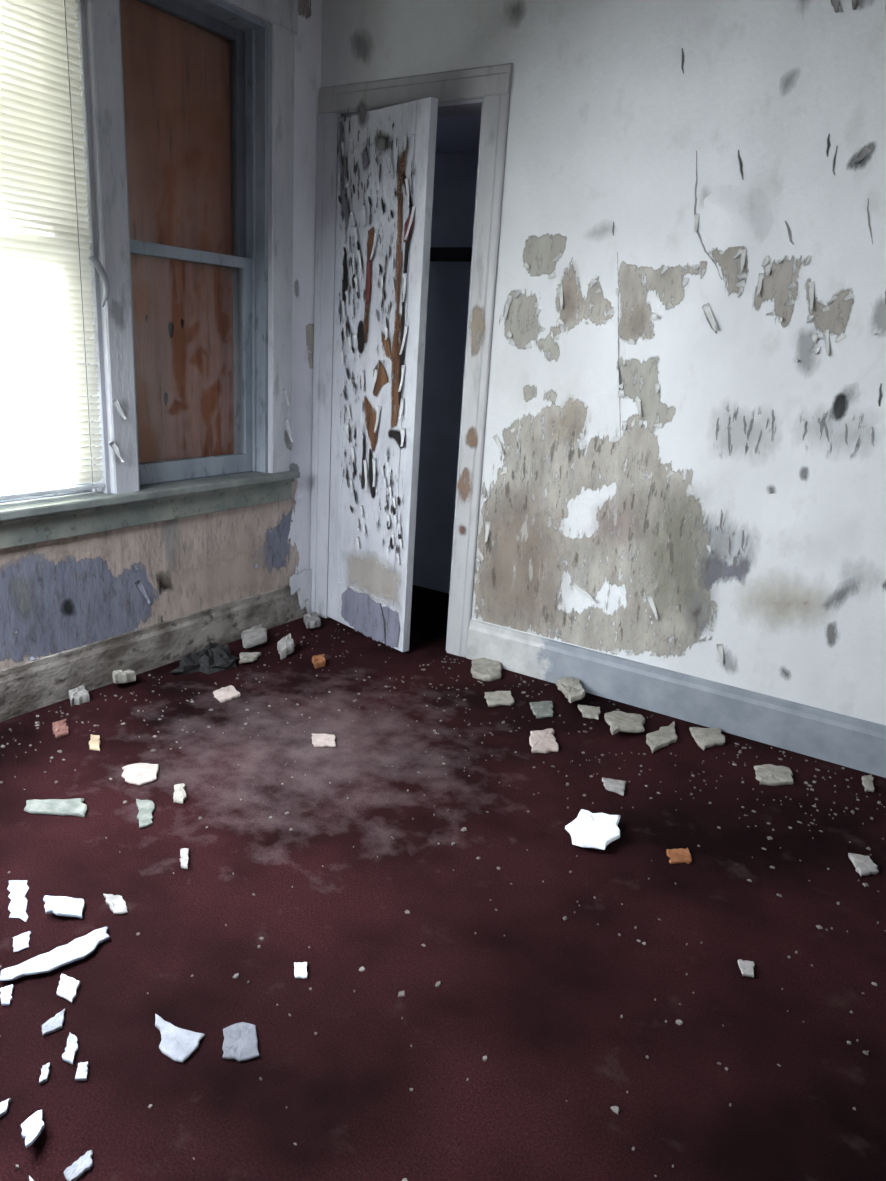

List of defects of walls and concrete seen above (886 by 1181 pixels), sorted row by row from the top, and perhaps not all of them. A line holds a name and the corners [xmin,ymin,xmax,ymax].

peeling [830,0,859,13]
peeling [499,233,855,362]
peeling [337,114,416,565]
peeling [716,410,775,454]
spalling [803,394,874,451]
peeling [0,388,302,631]
peeling [474,357,724,663]
peeling [0,651,59,670]
flaking render [277,633,294,660]
peeling [827,624,836,645]